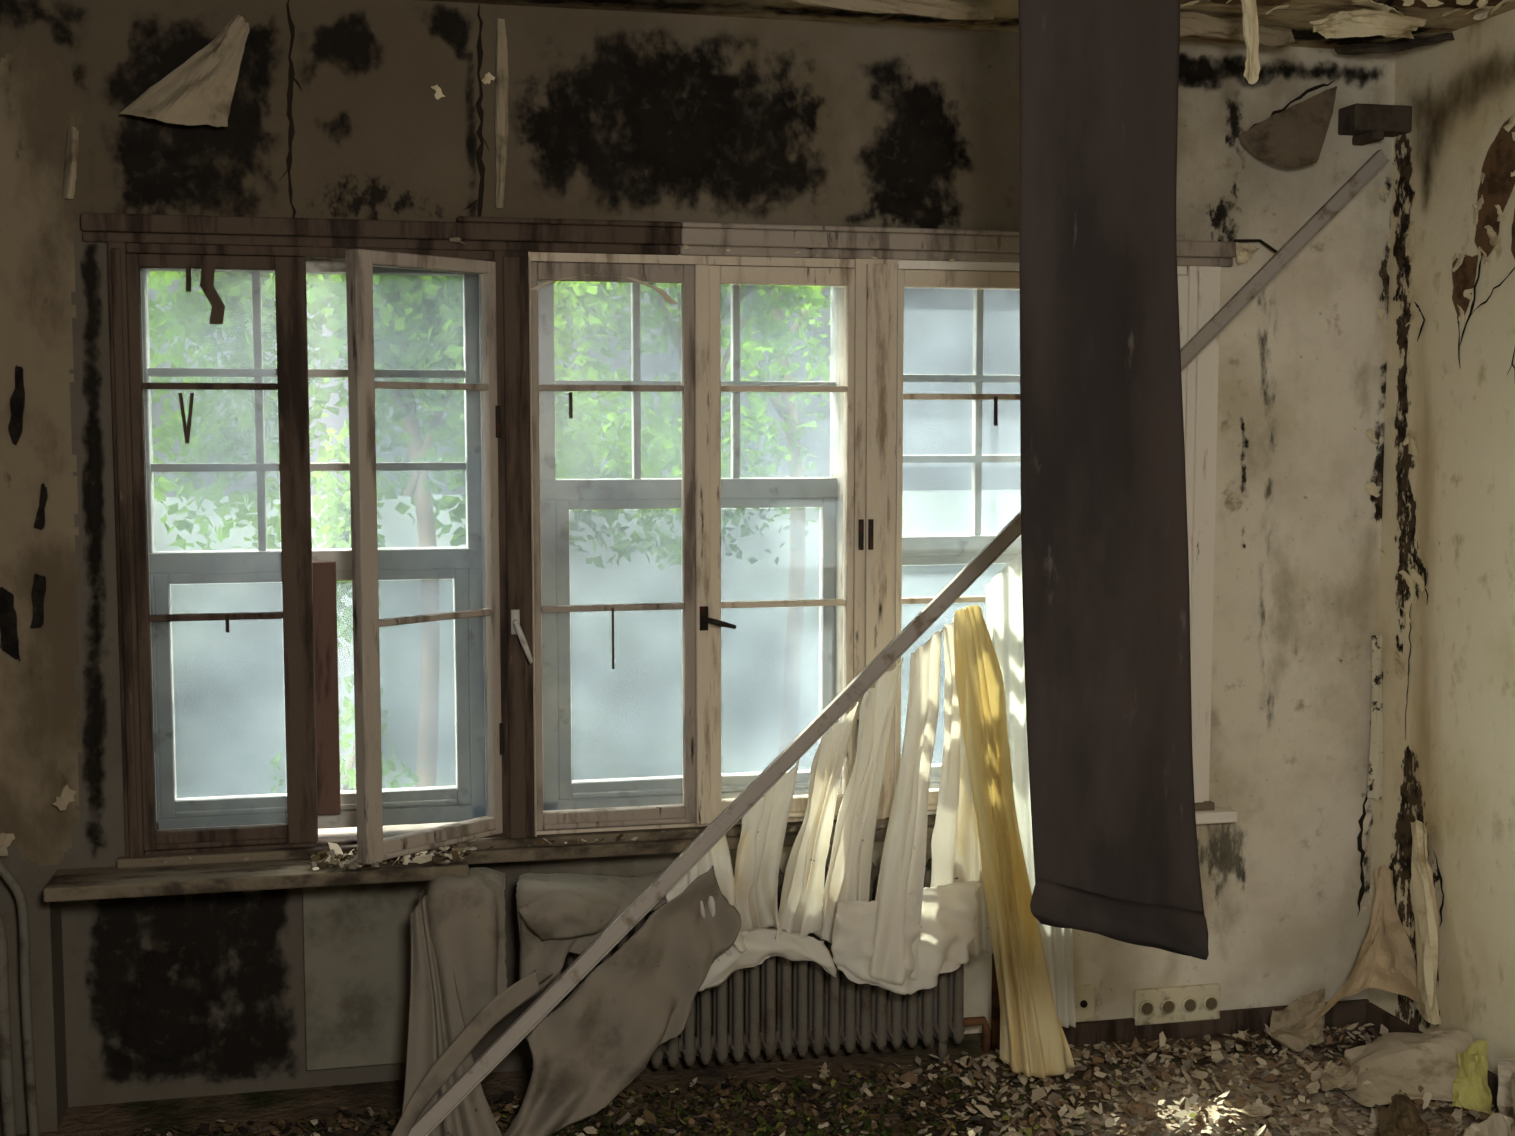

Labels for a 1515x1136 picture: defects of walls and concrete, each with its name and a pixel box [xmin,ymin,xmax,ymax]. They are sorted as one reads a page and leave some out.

water stain [109,20,274,217]
water stain [518,32,826,214]
water stain [847,60,971,229]
peeling [1180,0,1295,84]
water stain [1179,54,1379,89]
peeling [1309,0,1515,55]
flaking render [1450,112,1515,365]
water stain [1365,362,1387,522]
water stain [81,244,106,851]
flaking render [1389,134,1444,965]
water stain [86,889,294,1082]
flaking render [1395,994,1440,1030]